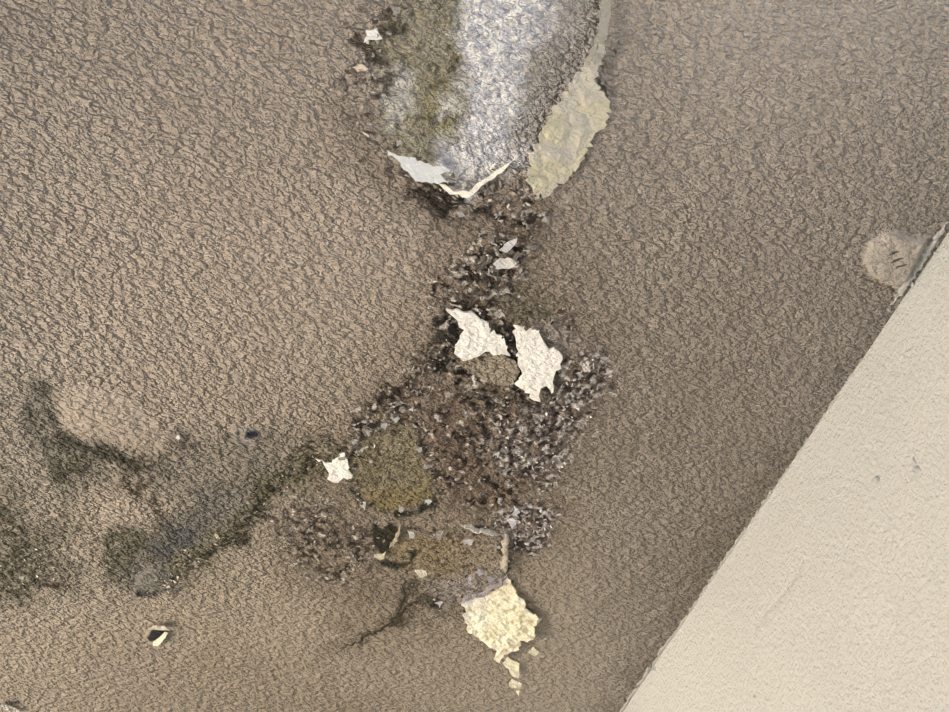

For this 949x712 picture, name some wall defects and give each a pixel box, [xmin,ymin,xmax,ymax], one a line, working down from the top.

leakage [0,77,525,712]
crack [339,575,441,649]
peeling [262,0,615,634]
peeling [503,657,522,696]
leakage [469,0,709,639]
leakage [583,173,949,712]